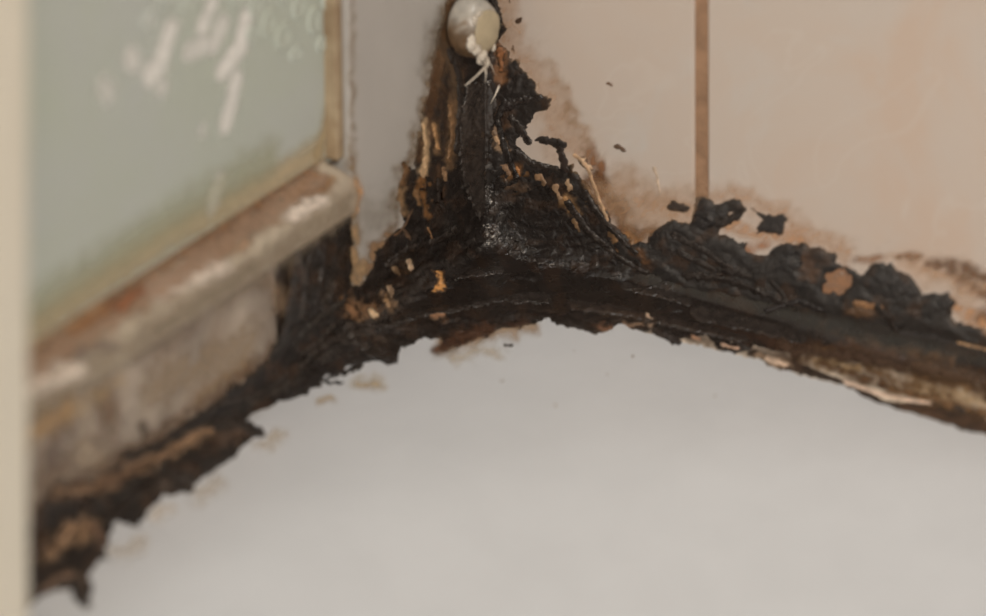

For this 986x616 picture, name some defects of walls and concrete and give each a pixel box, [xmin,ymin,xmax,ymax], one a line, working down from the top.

damp [124,0,228,96]
damp [220,69,242,134]
damp [28,118,326,343]
damp [298,0,986,435]
damp [28,215,363,610]